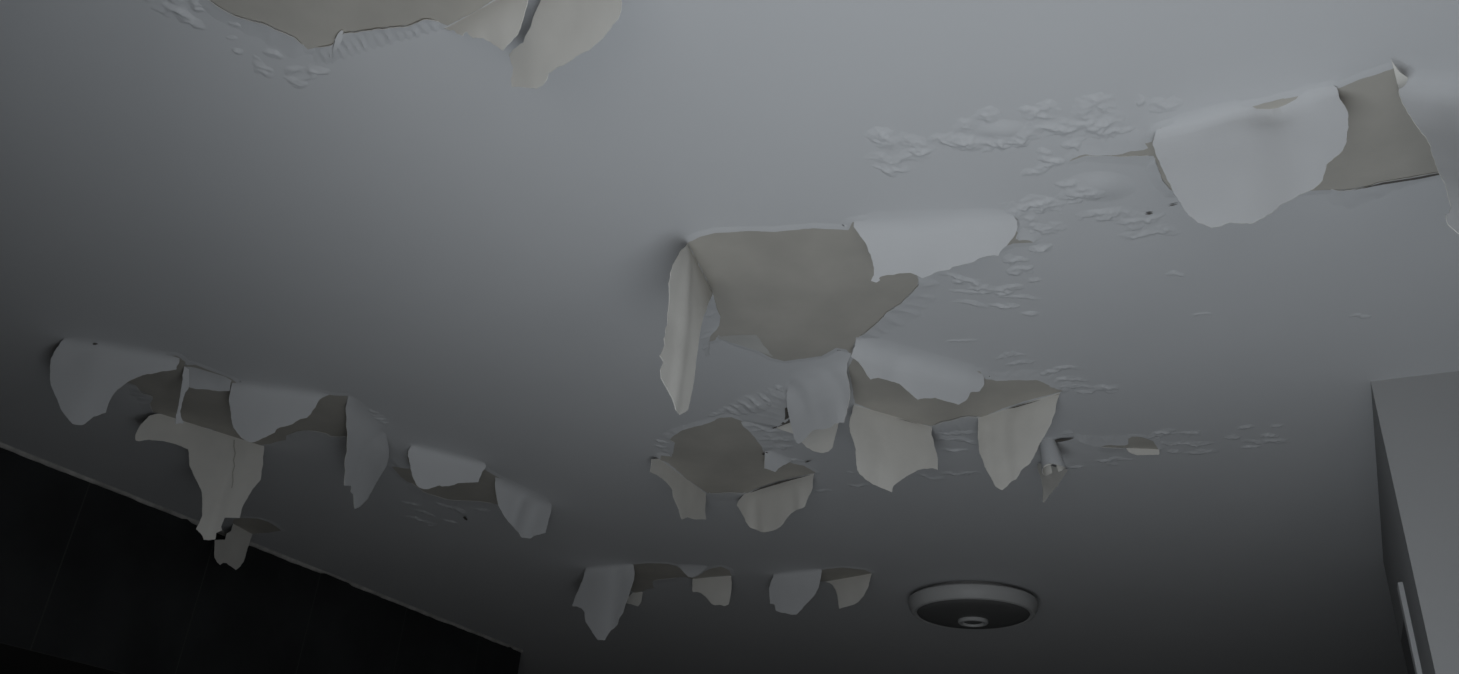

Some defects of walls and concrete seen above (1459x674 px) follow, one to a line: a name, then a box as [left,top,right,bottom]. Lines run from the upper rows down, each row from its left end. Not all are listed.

peeling [198,0,622,89]
peeling [1064,60,1459,234]
peeling [50,336,552,570]
peeling [650,208,1073,532]
peeling [572,561,735,640]
peeling [769,566,876,615]